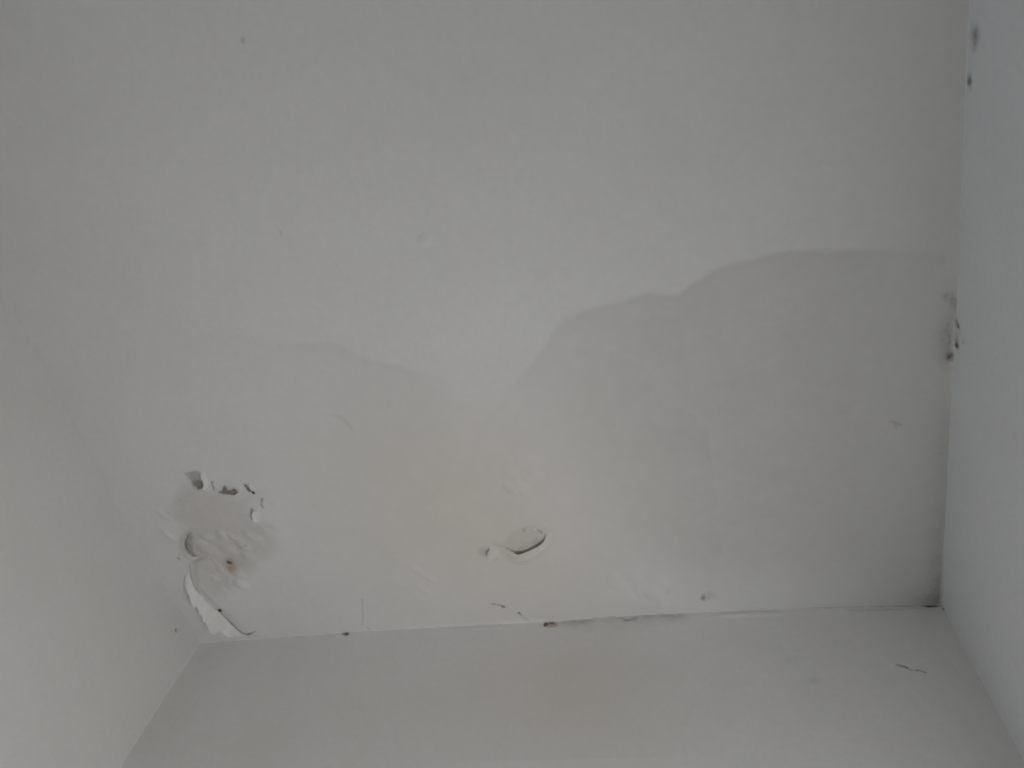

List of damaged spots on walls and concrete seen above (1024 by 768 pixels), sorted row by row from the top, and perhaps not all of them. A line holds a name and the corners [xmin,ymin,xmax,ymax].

peeling [184,569,248,637]